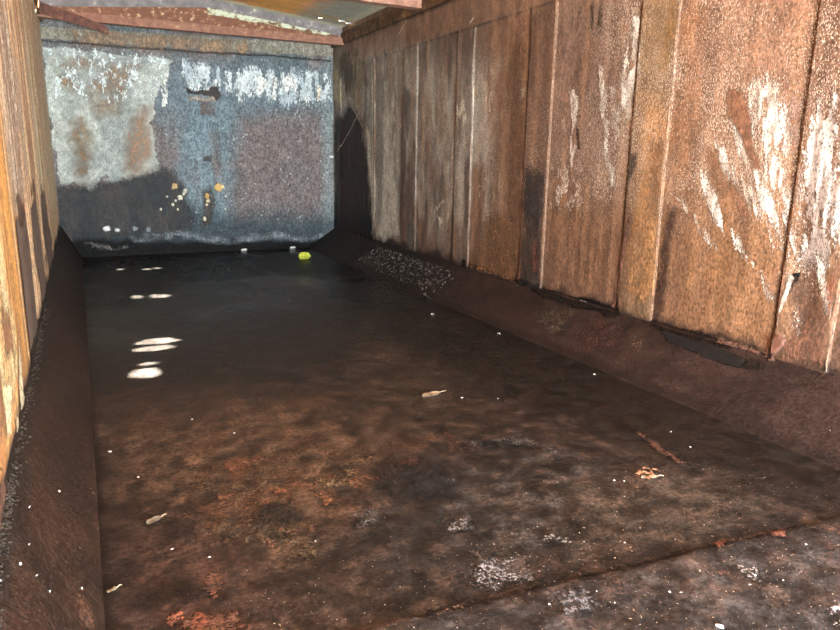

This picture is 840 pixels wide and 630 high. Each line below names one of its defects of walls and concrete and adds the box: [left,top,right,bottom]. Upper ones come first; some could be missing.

corrosion [2,310,13,353]
peeling [42,46,172,190]
spalling [186,86,221,115]
damp [332,45,493,252]
damp [598,11,641,187]
damp [654,197,717,321]
damp [699,168,775,301]
damp [714,125,803,266]
damp [813,252,832,323]
corrosion [174,432,478,557]
corrosion [165,609,250,630]
damp [466,557,534,593]